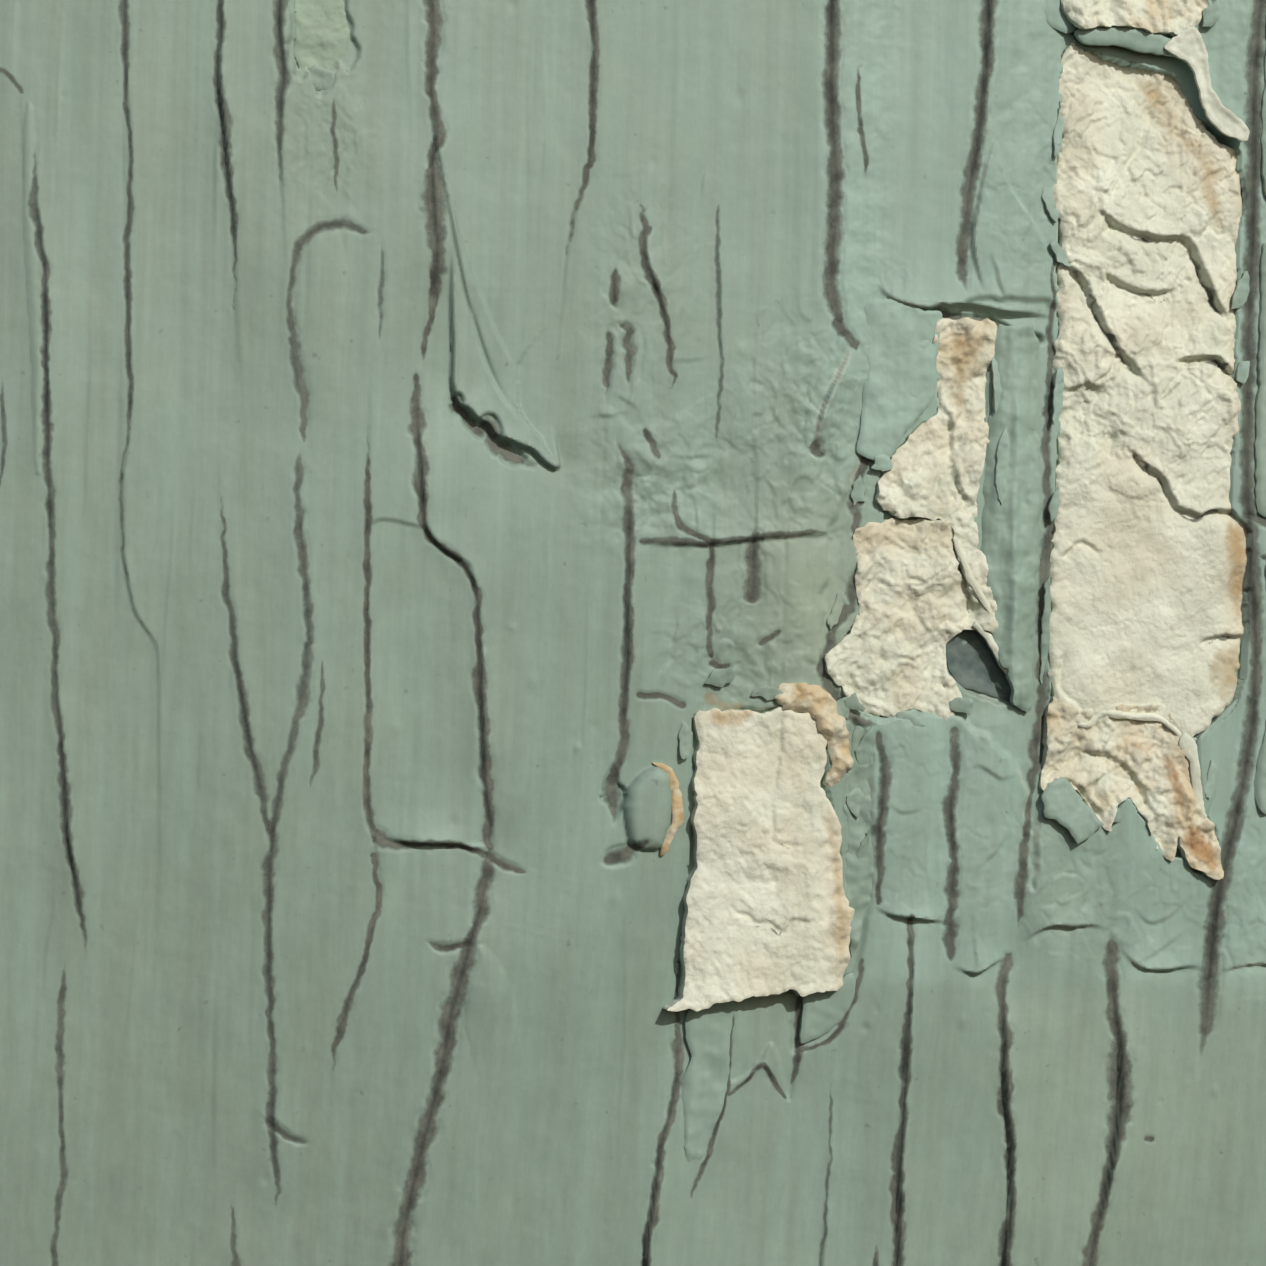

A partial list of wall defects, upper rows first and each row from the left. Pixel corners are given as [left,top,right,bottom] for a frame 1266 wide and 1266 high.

peeling [294,0,350,91]
crack [824,0,868,349]
crack [30,167,86,937]
crack [222,220,366,1193]
crack [331,0,525,1266]
crack [605,429,818,816]
crack [873,727,960,1266]
peeling [663,0,1266,1163]
crack [997,953,1016,1266]
crack [1016,262,1056,918]
crack [1084,940,1154,1266]
crack [1201,0,1266,1035]